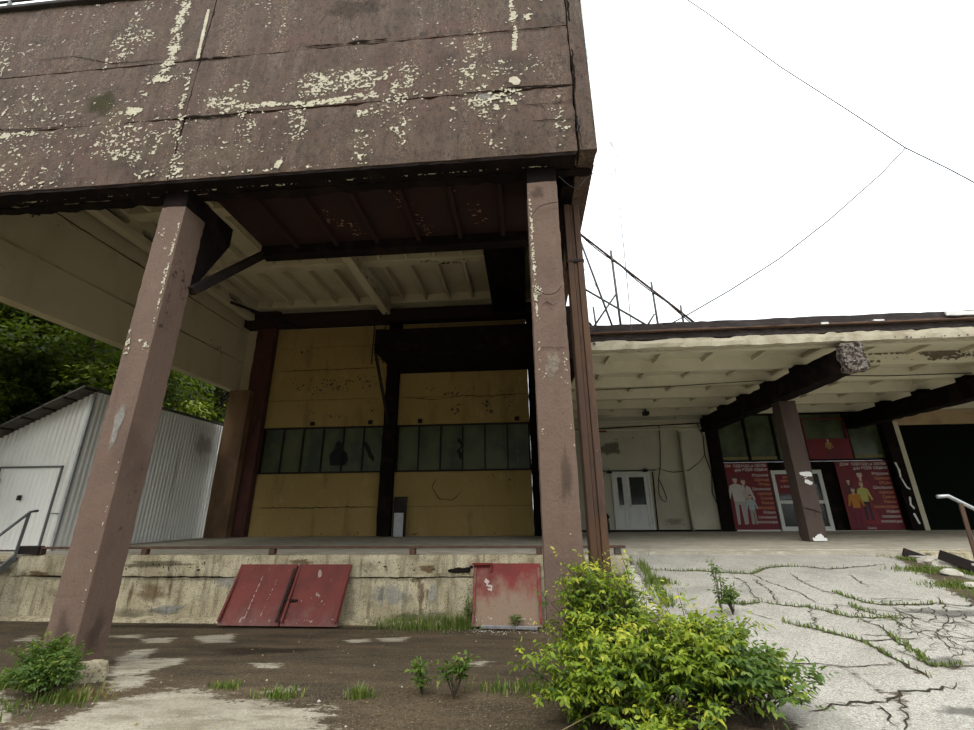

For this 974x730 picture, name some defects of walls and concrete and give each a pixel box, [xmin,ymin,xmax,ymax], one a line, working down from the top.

crack [184,54,240,62]
crack [182,111,257,120]
peeling [0,0,544,191]
spalling [528,193,543,319]
peeling [865,350,974,363]
crack [672,564,974,730]